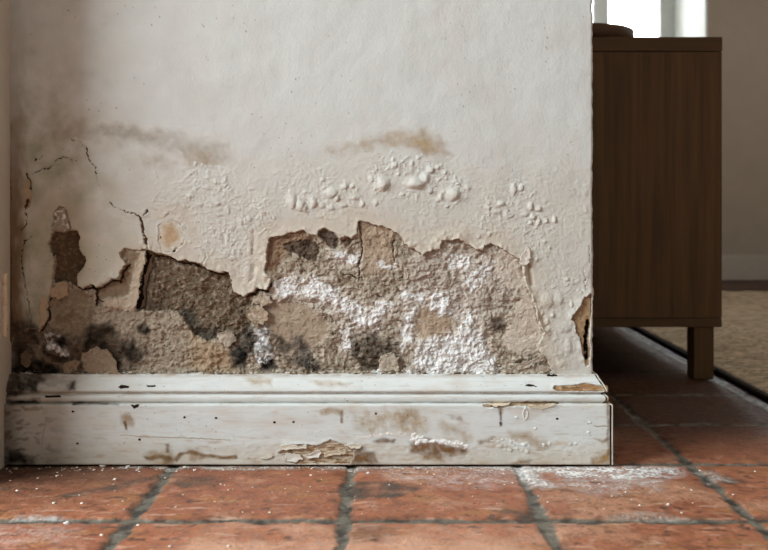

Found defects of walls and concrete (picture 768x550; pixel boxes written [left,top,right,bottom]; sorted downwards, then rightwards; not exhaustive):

crack [10,139,97,331]
efflorescence [332,250,358,266]
efflorescence [372,259,397,271]
efflorescence [446,253,503,293]
flaking render [11,206,608,393]
water stain [9,326,75,404]
mould [85,326,113,349]
mould [117,343,139,369]
water stain [231,323,289,370]
water stain [272,274,503,374]
peeling [280,443,361,463]